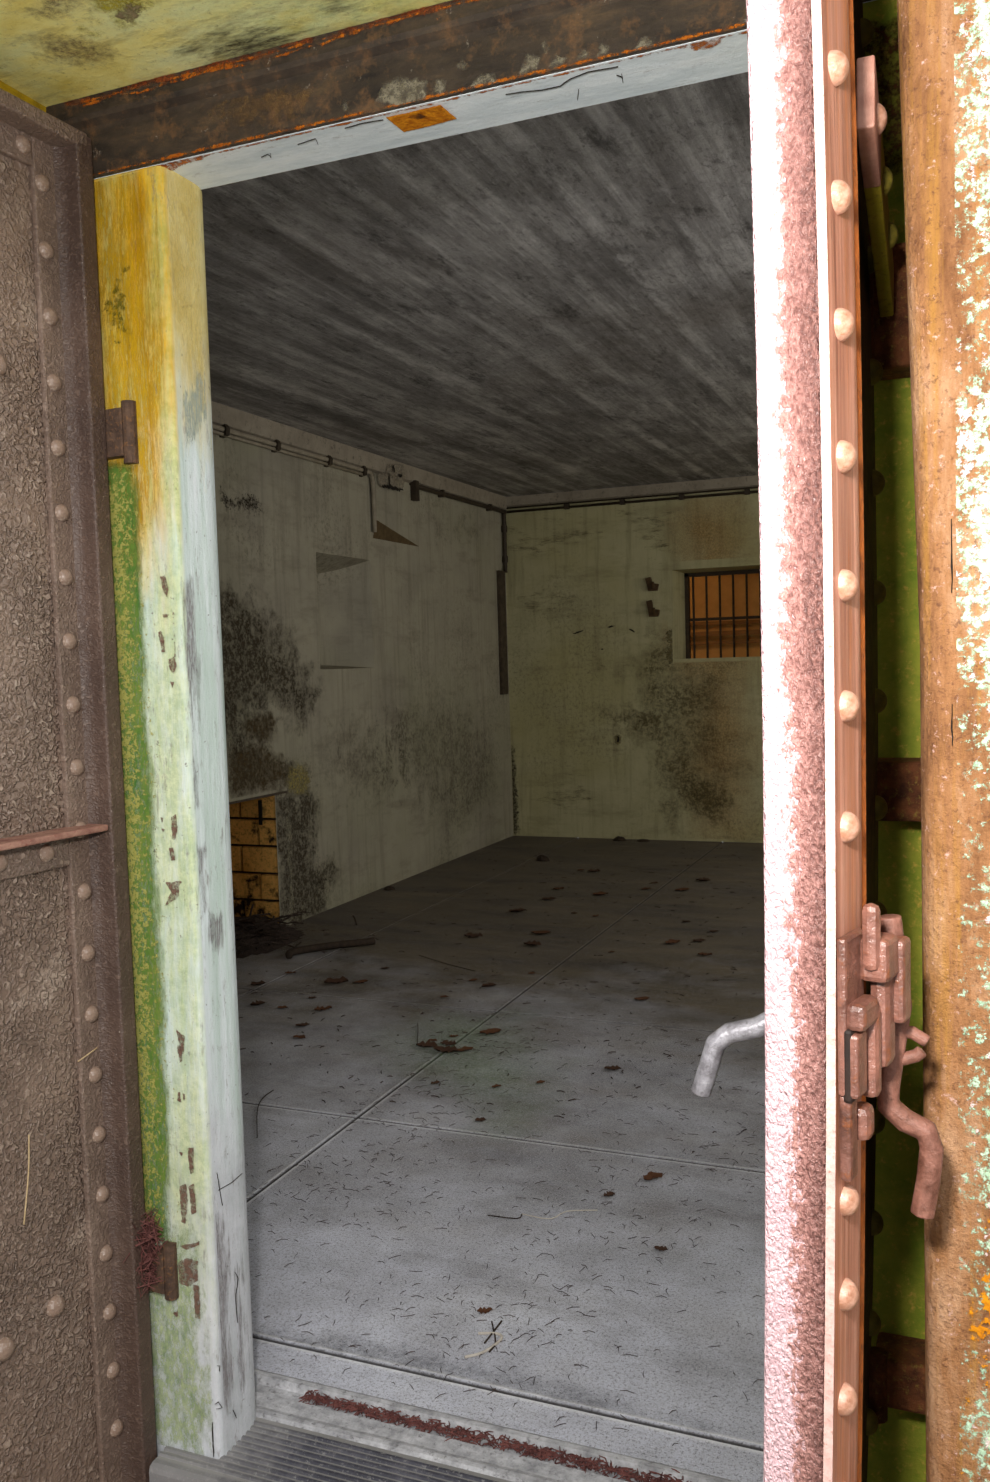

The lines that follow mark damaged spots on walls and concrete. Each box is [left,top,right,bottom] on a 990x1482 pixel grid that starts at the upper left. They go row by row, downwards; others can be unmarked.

water stain [184,27,296,57]
rust [65,0,478,106]
rust [93,23,747,180]
water stain [634,650,726,814]